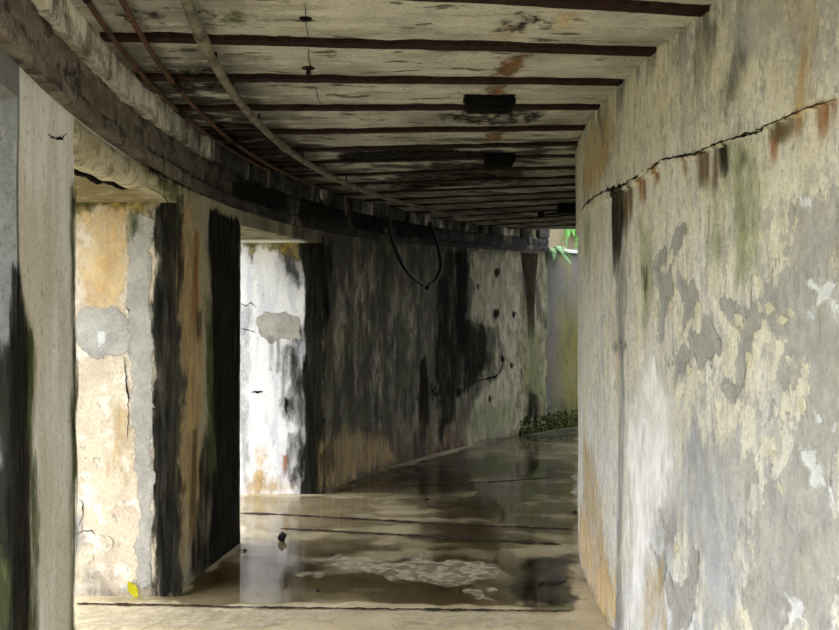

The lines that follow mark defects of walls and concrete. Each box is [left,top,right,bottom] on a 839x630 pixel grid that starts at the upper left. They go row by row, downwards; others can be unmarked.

corrosion [484,54,534,95]
corrosion [693,152,709,183]
crack [581,100,833,212]
corrosion [771,51,806,157]
water stain [0,263,40,630]
crack [122,357,130,436]
water stain [149,166,241,596]
water stain [277,234,332,494]
water stain [610,188,674,630]
peeling [652,222,721,386]
peeling [719,185,839,630]
peeling [649,507,699,630]